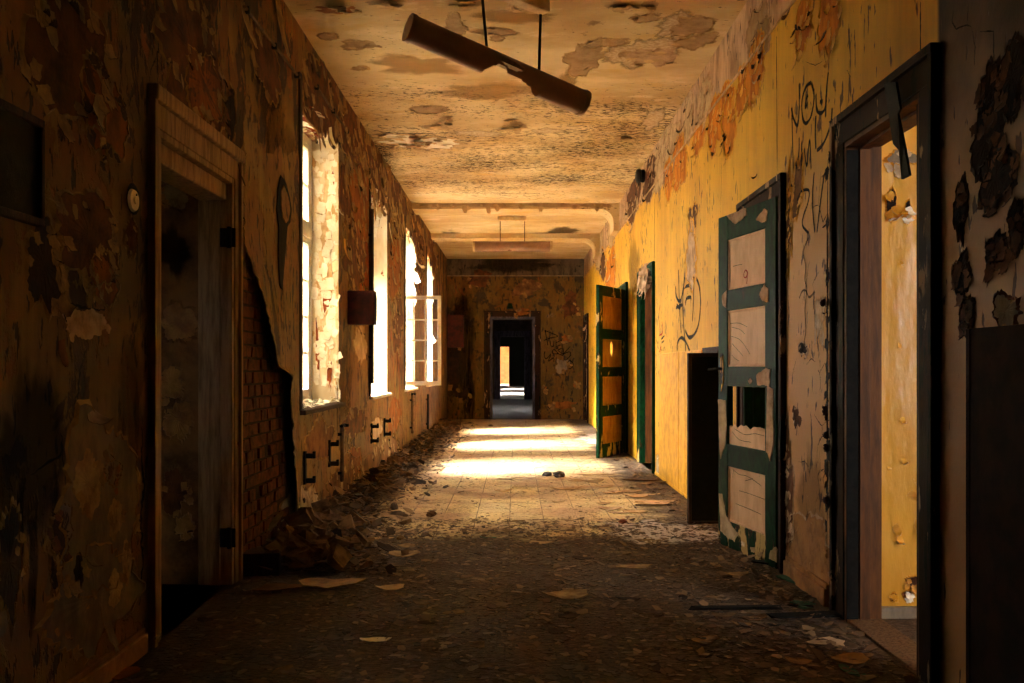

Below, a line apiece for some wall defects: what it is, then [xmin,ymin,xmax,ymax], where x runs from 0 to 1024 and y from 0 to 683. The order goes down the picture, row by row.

peeling [181,44,234,124]
peeling [236,0,463,553]
water stain [431,100,664,186]
peeling [562,0,720,78]
peeling [625,0,842,234]
peeling [951,30,1024,340]